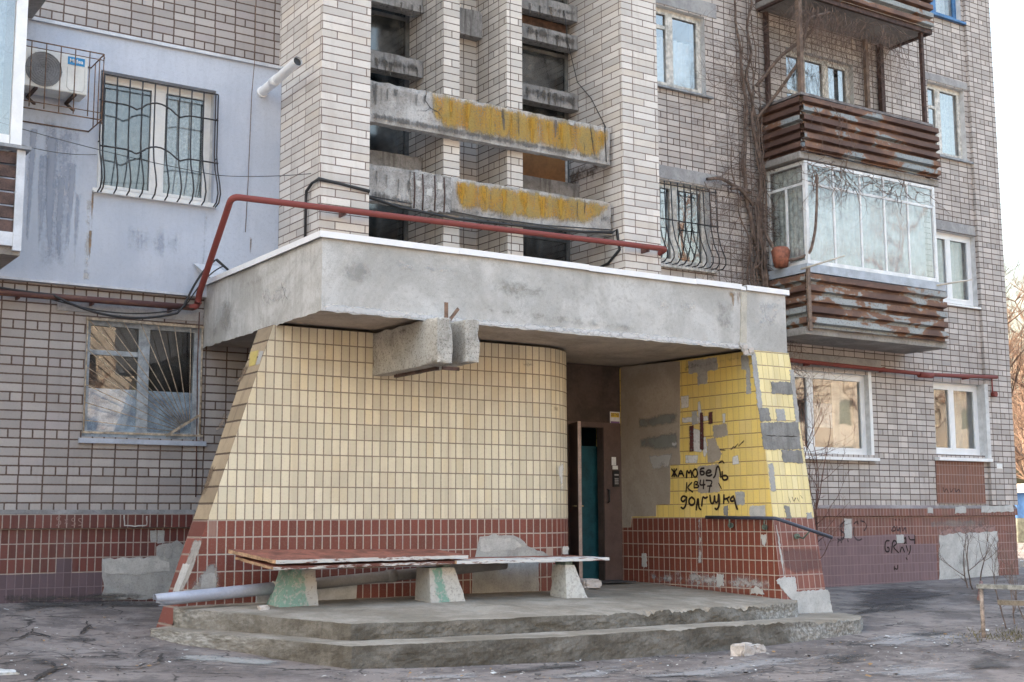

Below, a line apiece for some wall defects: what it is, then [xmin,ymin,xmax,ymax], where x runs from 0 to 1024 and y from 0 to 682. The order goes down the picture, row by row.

damp [27,130,91,255]
spalling [409,170,453,213]
peeling [738,342,803,492]
peeling [723,491,745,516]
peeling [103,557,190,592]